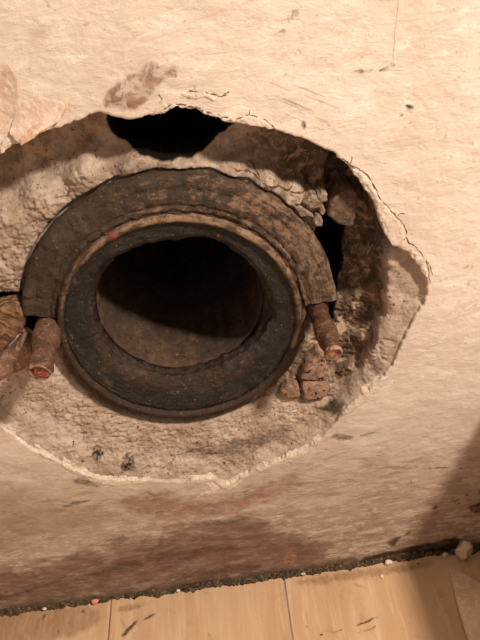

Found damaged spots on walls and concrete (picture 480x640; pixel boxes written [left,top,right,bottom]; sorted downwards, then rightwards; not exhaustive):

water stain [104,64,177,108]
crack [159,90,275,130]
crack [230,160,306,194]
crack [339,158,433,283]
spalling [0,63,428,498]
water stain [121,489,272,516]
water stain [0,520,325,607]
water stain [362,538,459,562]